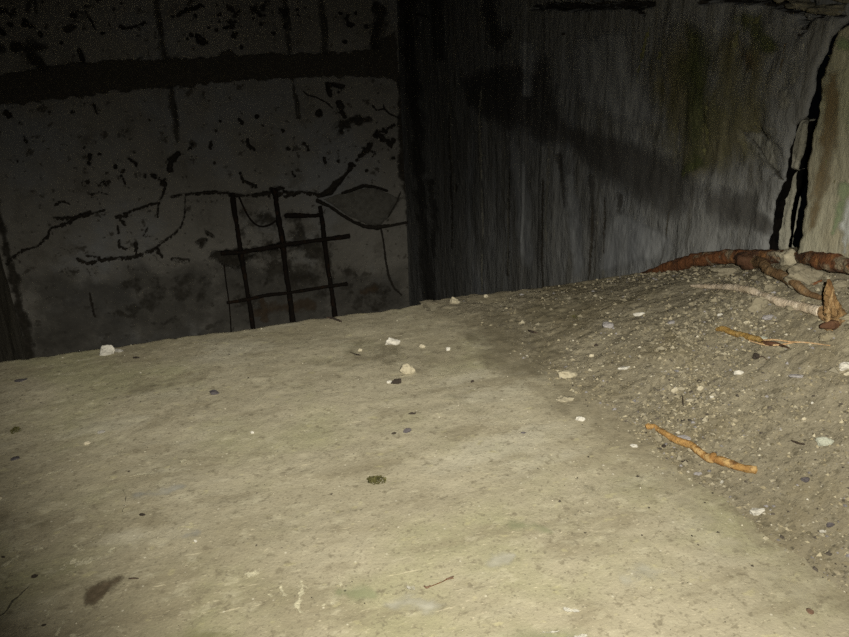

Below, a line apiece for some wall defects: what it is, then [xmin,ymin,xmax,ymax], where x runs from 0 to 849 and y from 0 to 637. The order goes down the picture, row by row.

crack [5,171,317,266]
spalling [211,188,351,332]
crack [769,121,817,250]
leakage [840,201,849,253]
leakage [85,576,121,605]